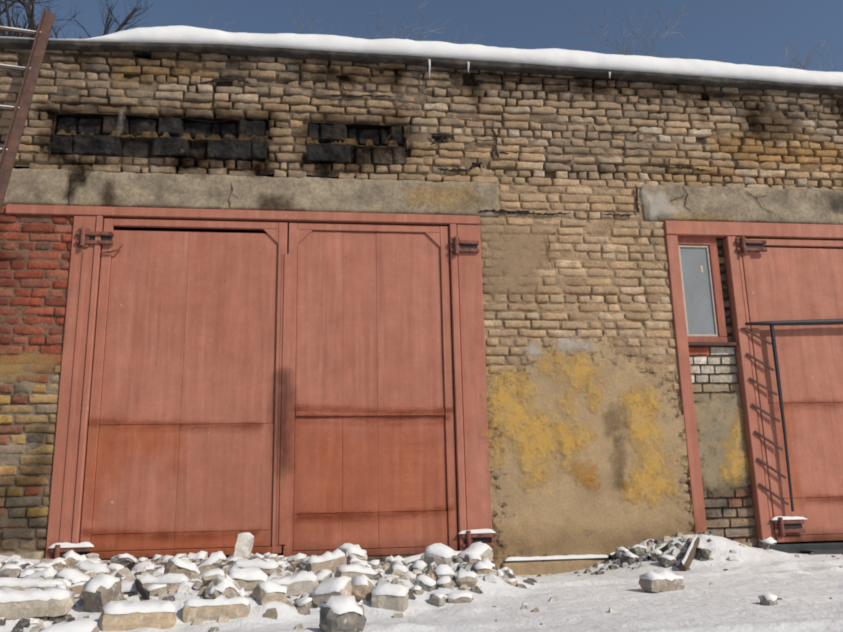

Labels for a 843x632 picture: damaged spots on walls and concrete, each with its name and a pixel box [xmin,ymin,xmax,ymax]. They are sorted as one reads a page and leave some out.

crack [603,185,640,217]
crack [644,158,711,212]